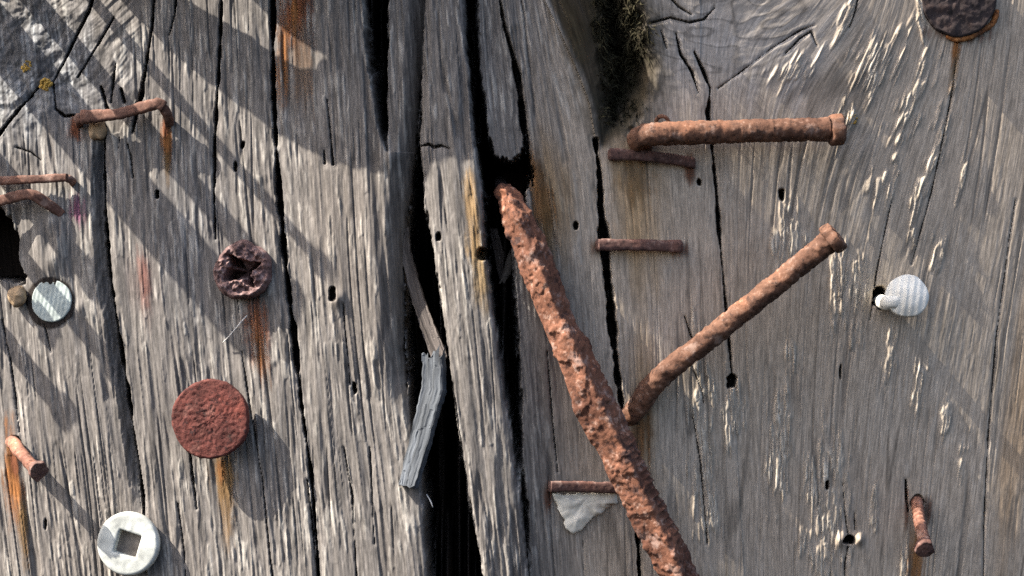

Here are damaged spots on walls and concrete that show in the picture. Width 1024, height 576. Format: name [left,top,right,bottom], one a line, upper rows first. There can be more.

corrosion [279,0,310,91]
crack [371,0,389,124]
corrosion [532,155,556,241]
crack [650,0,740,374]
crack [593,139,623,407]
corrosion [245,299,268,346]
crack [414,176,483,576]
corrosion [2,423,28,554]
crack [138,451,146,516]
corrosion [216,455,233,508]
crack [634,532,642,576]
corrosion [909,535,923,576]